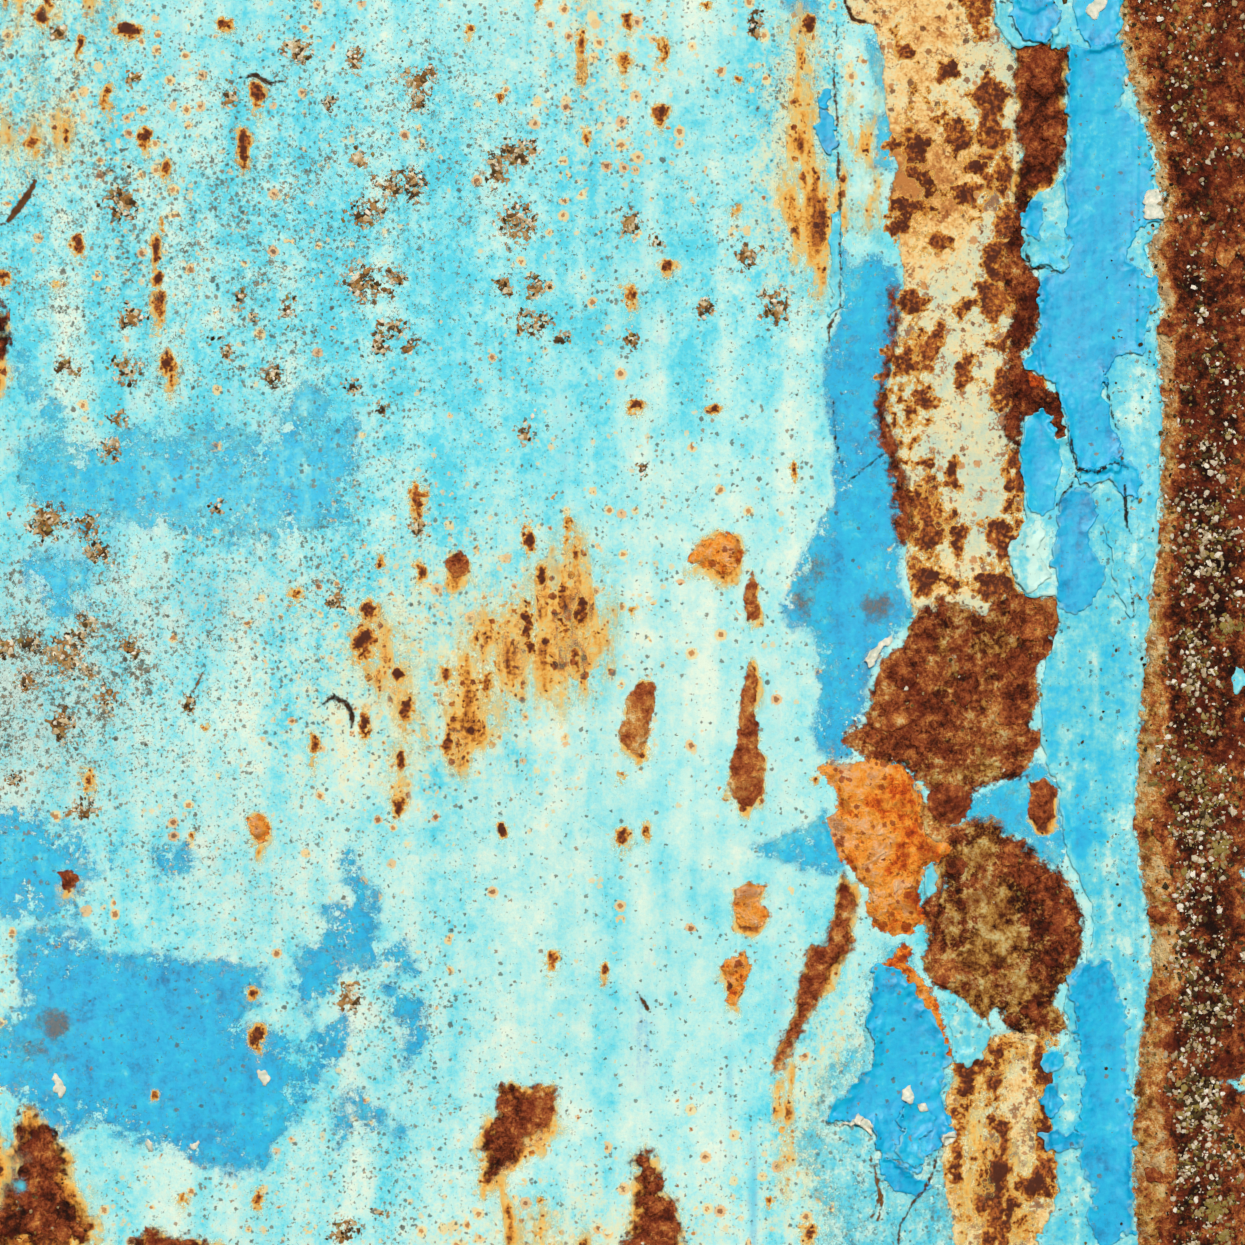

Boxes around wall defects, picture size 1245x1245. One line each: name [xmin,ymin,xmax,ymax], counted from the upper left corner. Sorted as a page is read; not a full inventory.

crack [826,0,878,352]
rust [1001,43,1069,453]
rust [870,287,917,546]
rust [349,515,637,819]
rust [721,660,767,819]
peeling [751,810,843,875]
rust [810,589,1085,1057]
peeling [783,0,1165,1245]
rust [1116,0,1245,1245]
rust [0,1106,104,1245]
rust [473,1081,591,1245]
rust [619,1148,686,1245]